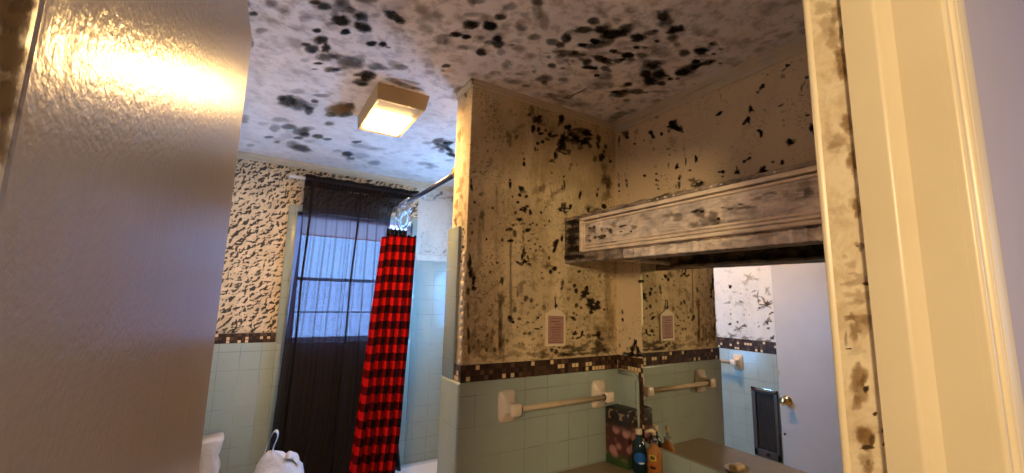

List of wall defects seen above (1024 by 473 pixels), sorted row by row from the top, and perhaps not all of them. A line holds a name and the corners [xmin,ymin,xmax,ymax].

damp [302,28,376,86]
damp [310,0,390,48]
damp [385,11,405,24]
damp [450,14,514,56]
damp [523,11,723,101]
damp [278,95,318,115]
damp [283,125,322,152]
damp [433,138,455,157]
damp [523,107,636,166]
damp [499,176,632,356]
damp [853,367,869,393]
damp [858,428,885,450]